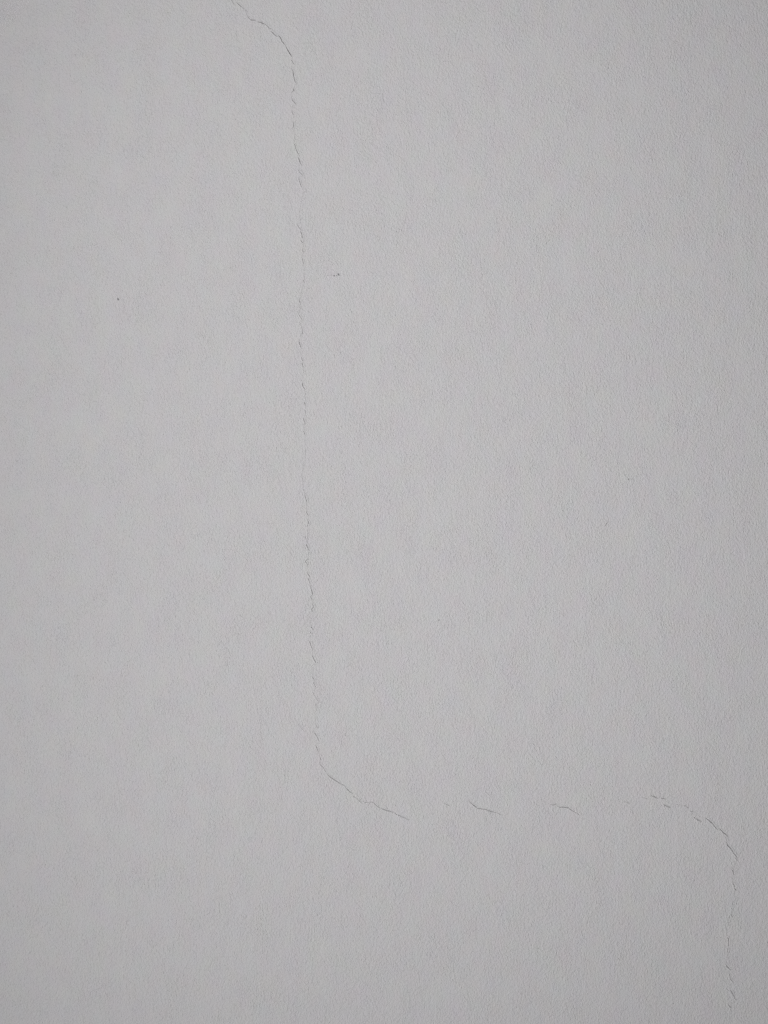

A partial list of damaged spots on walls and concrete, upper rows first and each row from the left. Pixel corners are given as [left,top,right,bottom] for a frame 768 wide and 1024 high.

crack [230,0,410,821]
crack [623,794,739,1019]